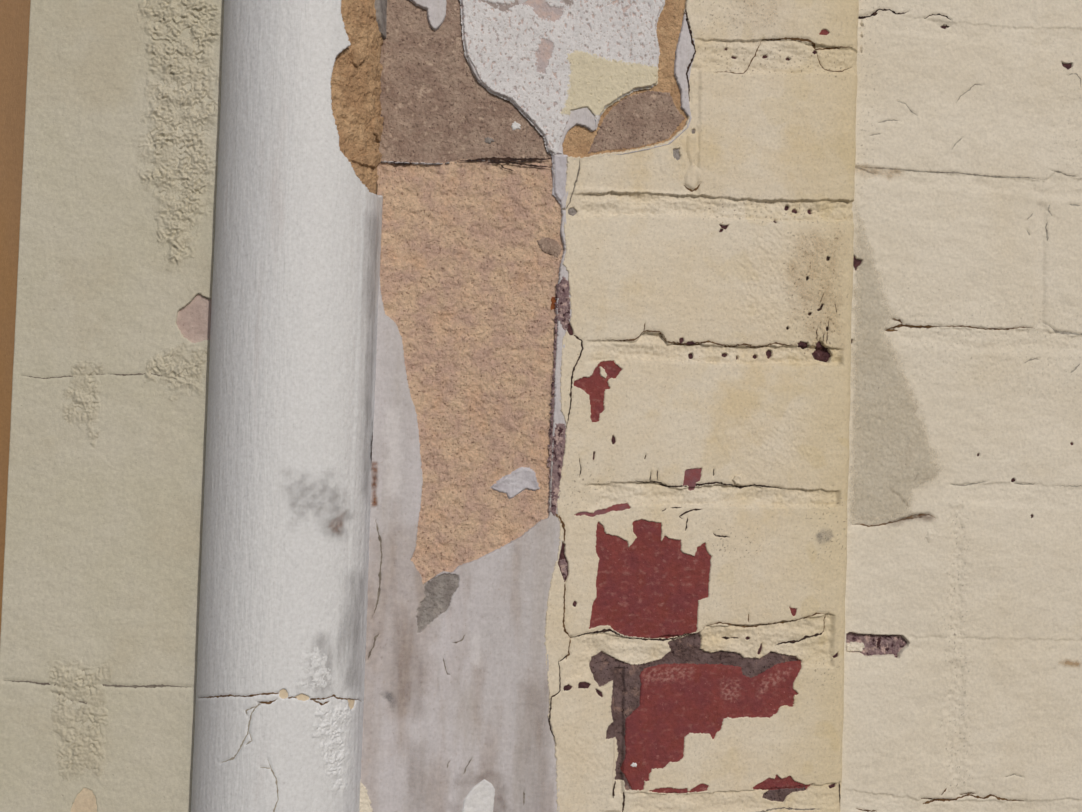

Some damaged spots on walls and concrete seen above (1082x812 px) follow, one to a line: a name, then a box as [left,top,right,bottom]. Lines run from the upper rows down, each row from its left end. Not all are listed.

spalling [177,294,212,343]
spalling [331,0,695,633]
crack [612,324,791,348]
crack [566,335,584,427]
crack [637,455,782,531]
crack [556,514,566,542]
peeling [563,503,801,794]
crack [548,584,826,742]
spalling [832,632,907,658]
peeling [359,782,373,812]
peeling [462,779,495,812]
peeling [753,775,811,802]